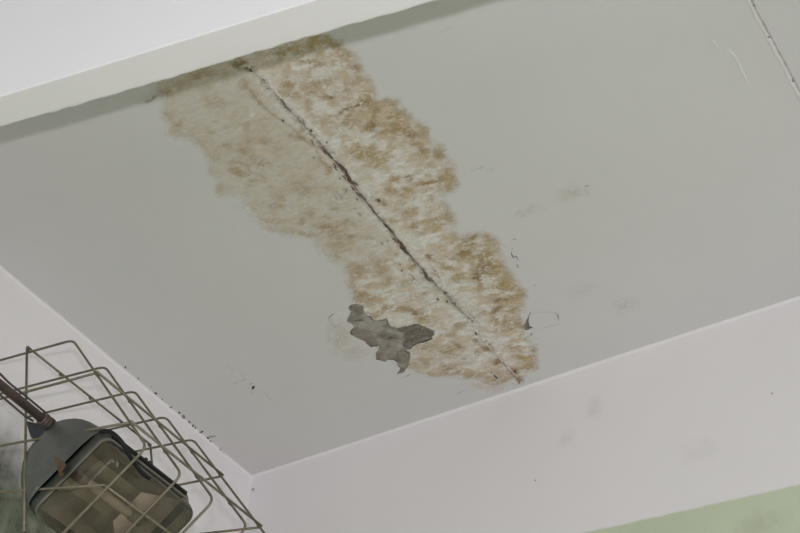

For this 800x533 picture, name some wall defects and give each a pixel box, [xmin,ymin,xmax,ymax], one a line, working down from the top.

leakage [158,34,535,384]
crack [249,69,520,384]
spalling [346,303,436,375]
crack [746,0,800,103]